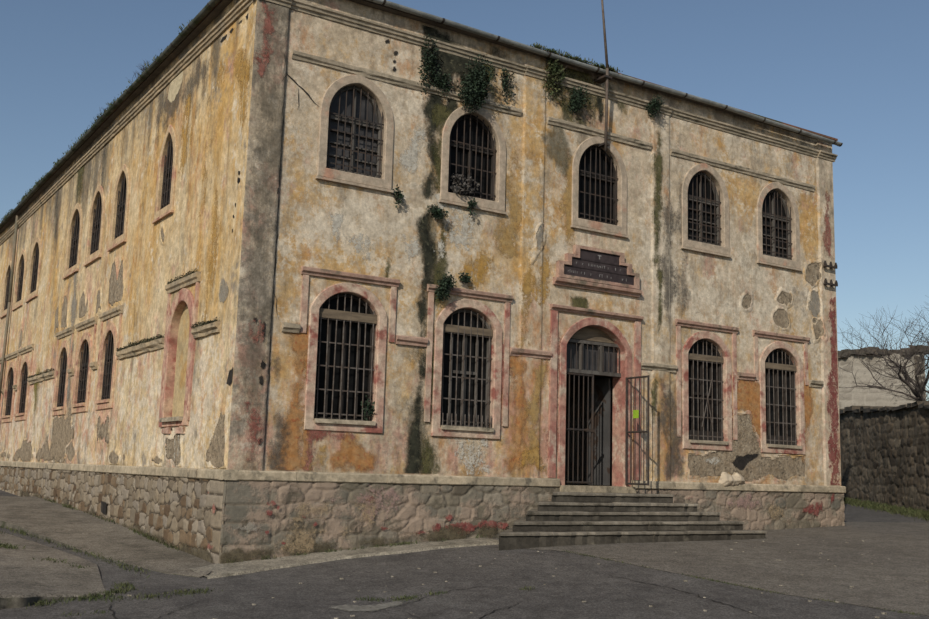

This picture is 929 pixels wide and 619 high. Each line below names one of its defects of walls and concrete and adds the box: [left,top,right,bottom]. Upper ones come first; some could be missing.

water stain [423,54,458,199]
flaking render [54,257,126,337]
crack [263,55,317,458]
water stain [417,210,448,334]
water stain [460,174,523,288]
water stain [652,132,689,328]
flaking render [0,407,77,463]
flaking render [96,412,127,465]
flaking render [149,426,183,467]
flaking render [203,403,228,468]
water stain [405,348,440,474]
flaking render [684,410,808,483]